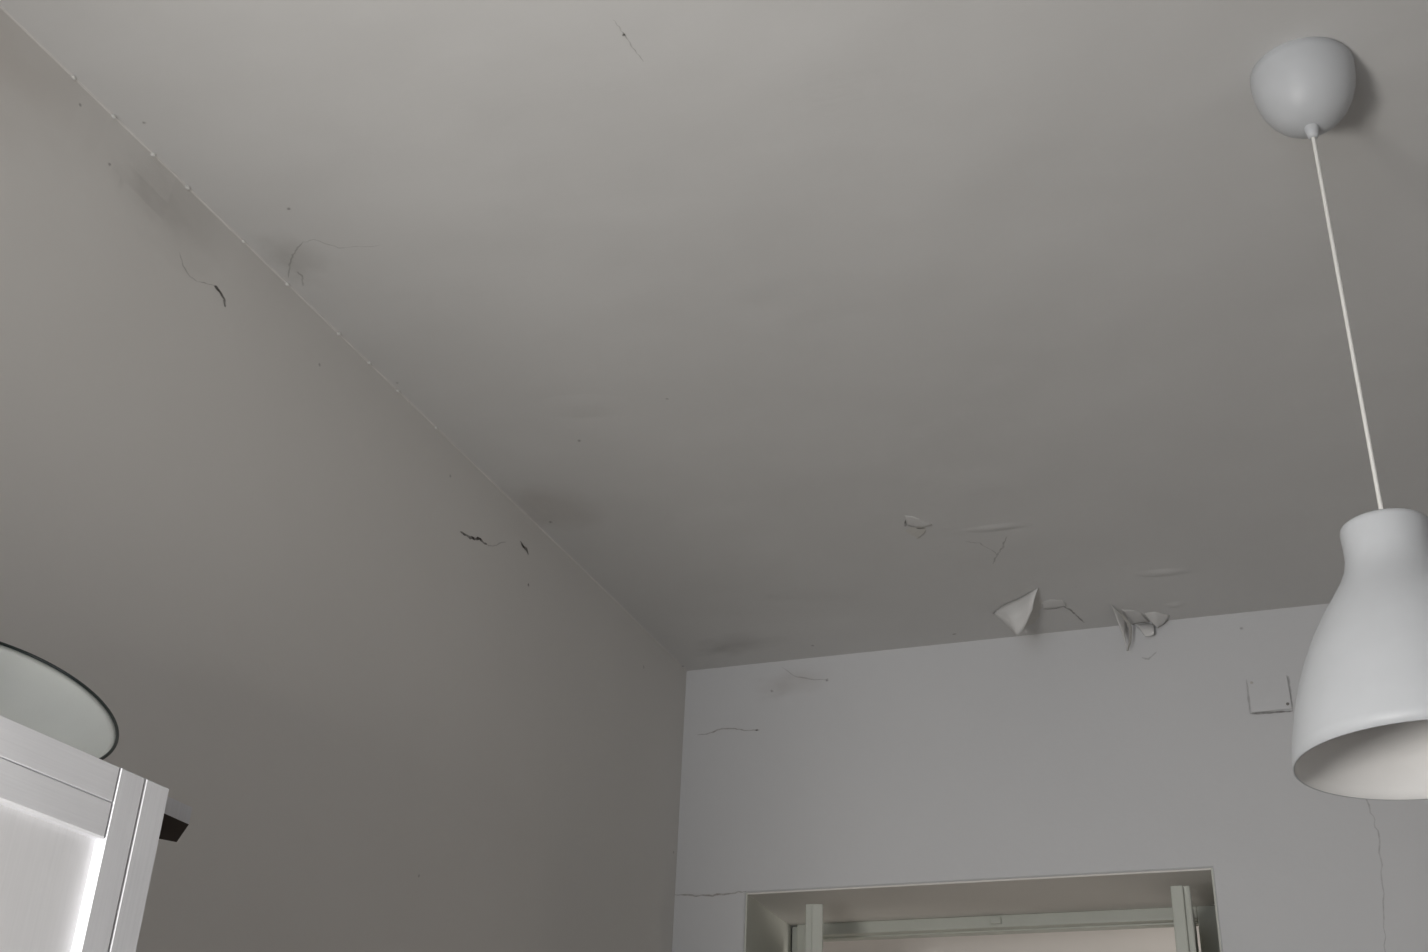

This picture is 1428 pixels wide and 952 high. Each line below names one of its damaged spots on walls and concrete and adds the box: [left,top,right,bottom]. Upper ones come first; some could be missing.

crack [460,531,529,585]
peeling [993,588,1066,636]